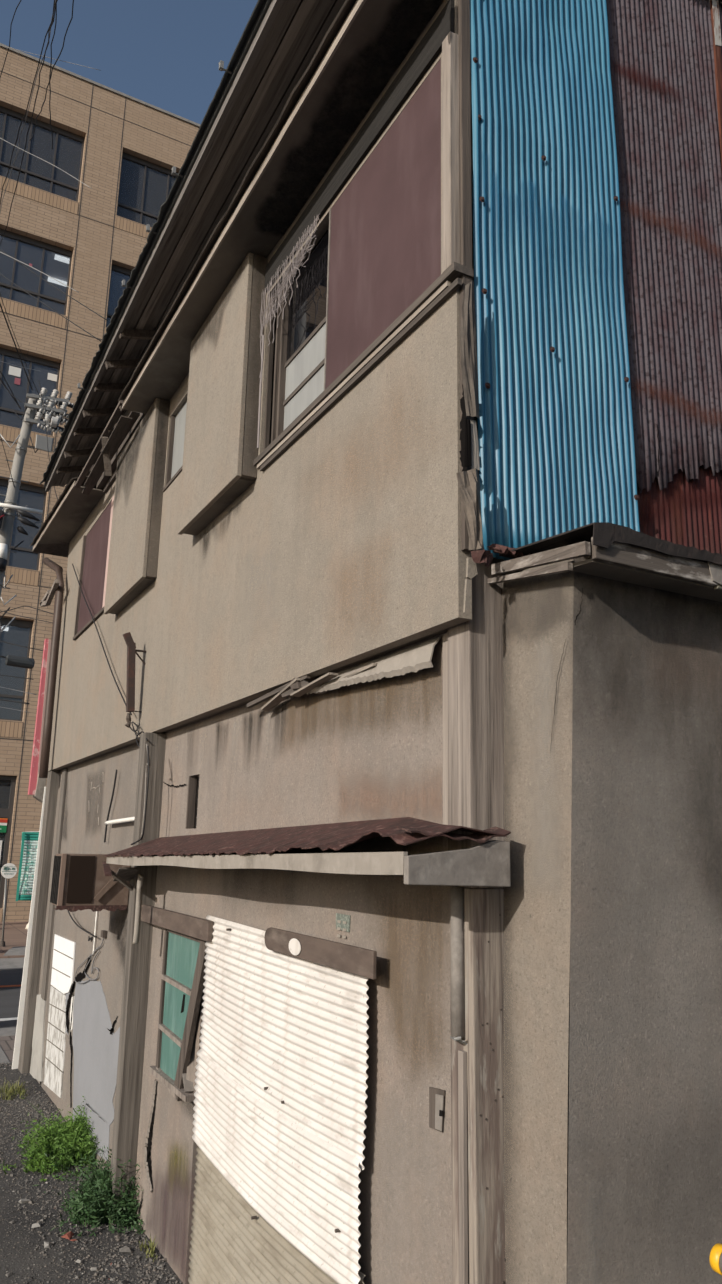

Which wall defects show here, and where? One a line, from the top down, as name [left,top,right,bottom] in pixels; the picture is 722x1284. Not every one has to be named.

peeling [456,281,493,613]
rust [637,465,722,554]
rust [104,817,511,857]
peeling [62,980,120,1161]
crack [138,1080,157,1214]